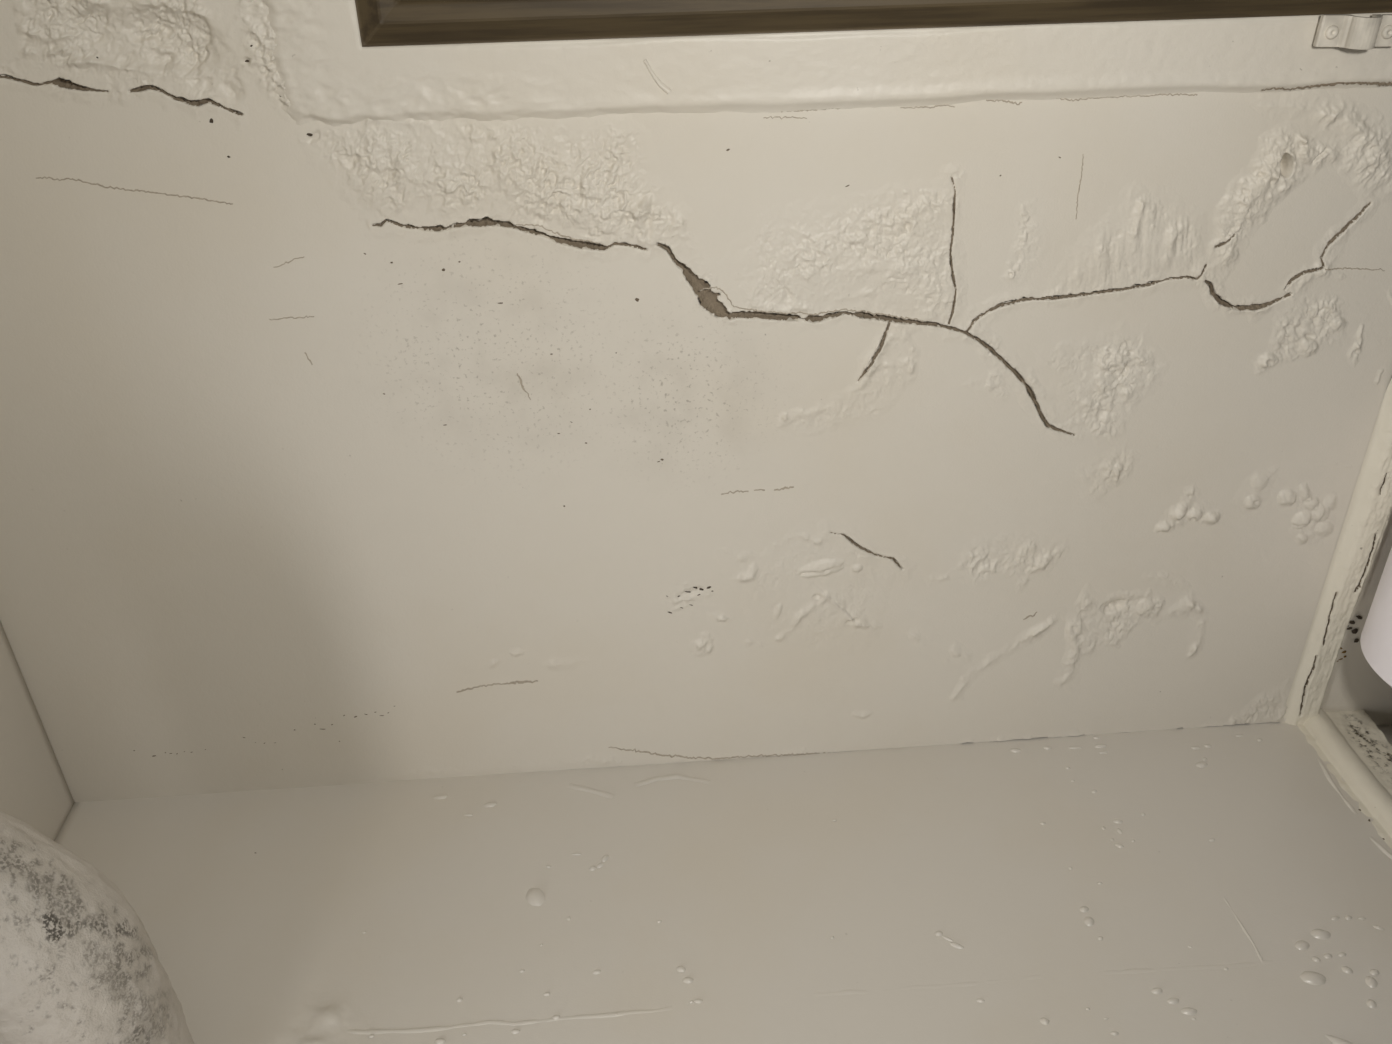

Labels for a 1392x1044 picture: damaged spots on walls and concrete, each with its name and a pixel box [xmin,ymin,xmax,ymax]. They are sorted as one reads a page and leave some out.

crack [0,75,251,132]
crack [358,154,1385,448]
crack [817,517,918,582]